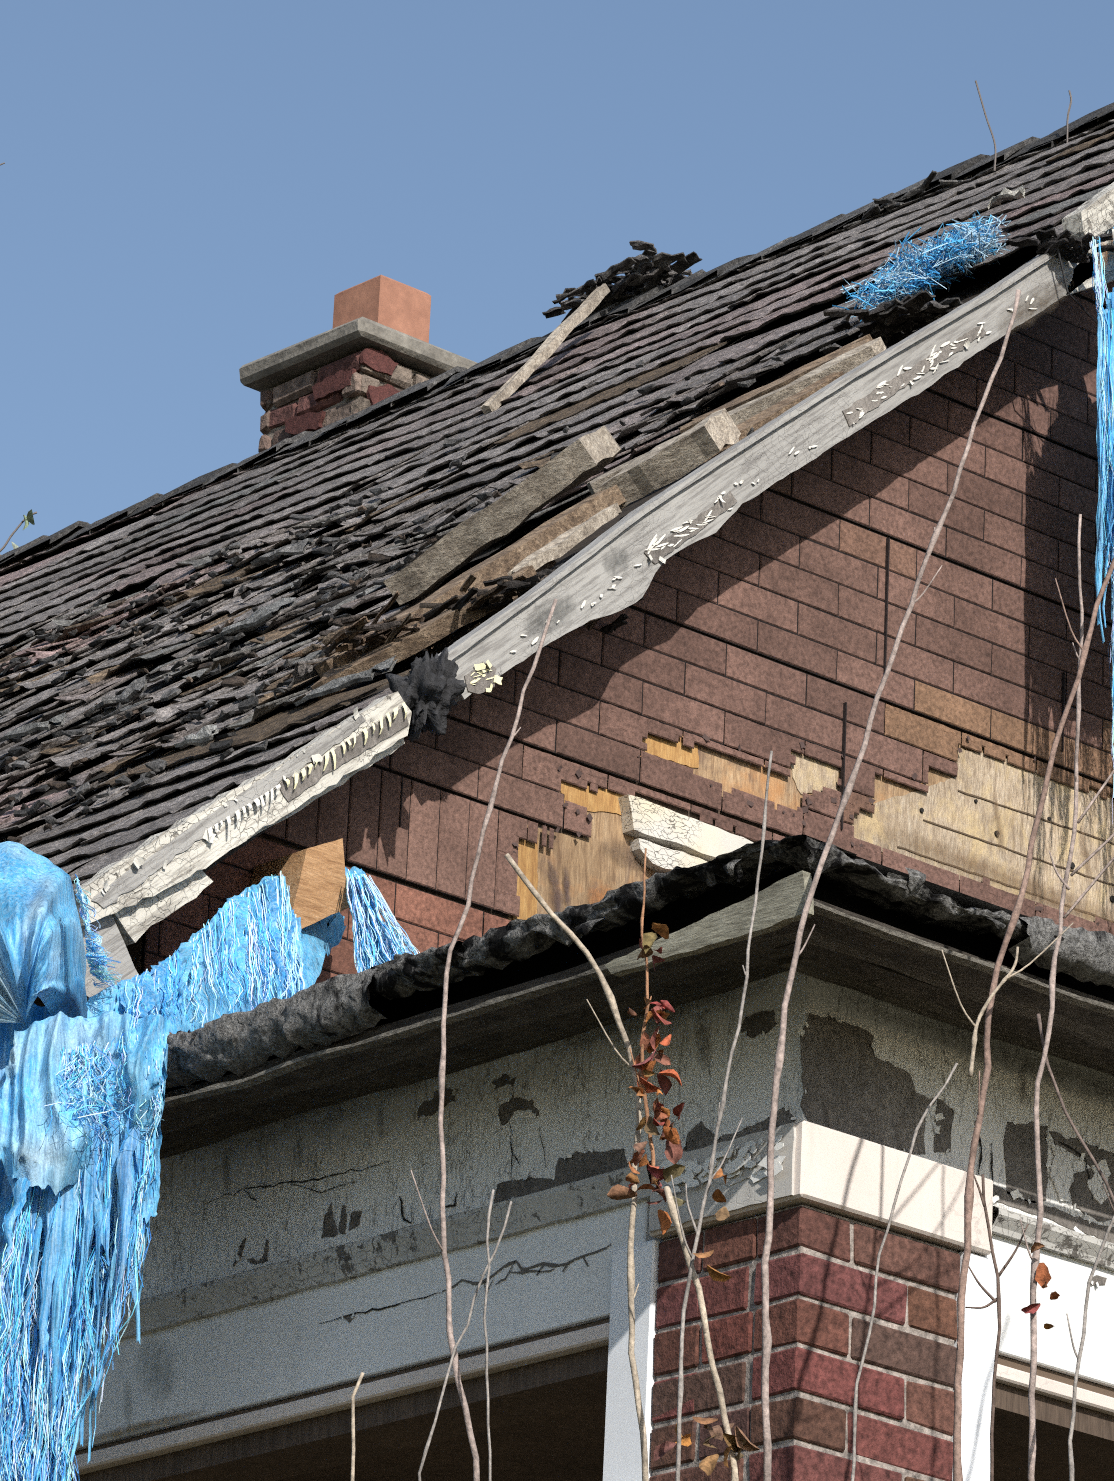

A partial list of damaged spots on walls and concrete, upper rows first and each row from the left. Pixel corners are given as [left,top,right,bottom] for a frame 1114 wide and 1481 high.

peeling [91,702,409,908]
peeling [417,1089,456,1120]
peeling [489,1074,539,1125]
peeling [657,1010,958,1202]
peeling [493,1148,628,1204]
peeling [993,1119,1114,1243]
peeling [318,1202,362,1238]
crack [320,1243,612,1324]
peeling [1091,1275,1107,1287]